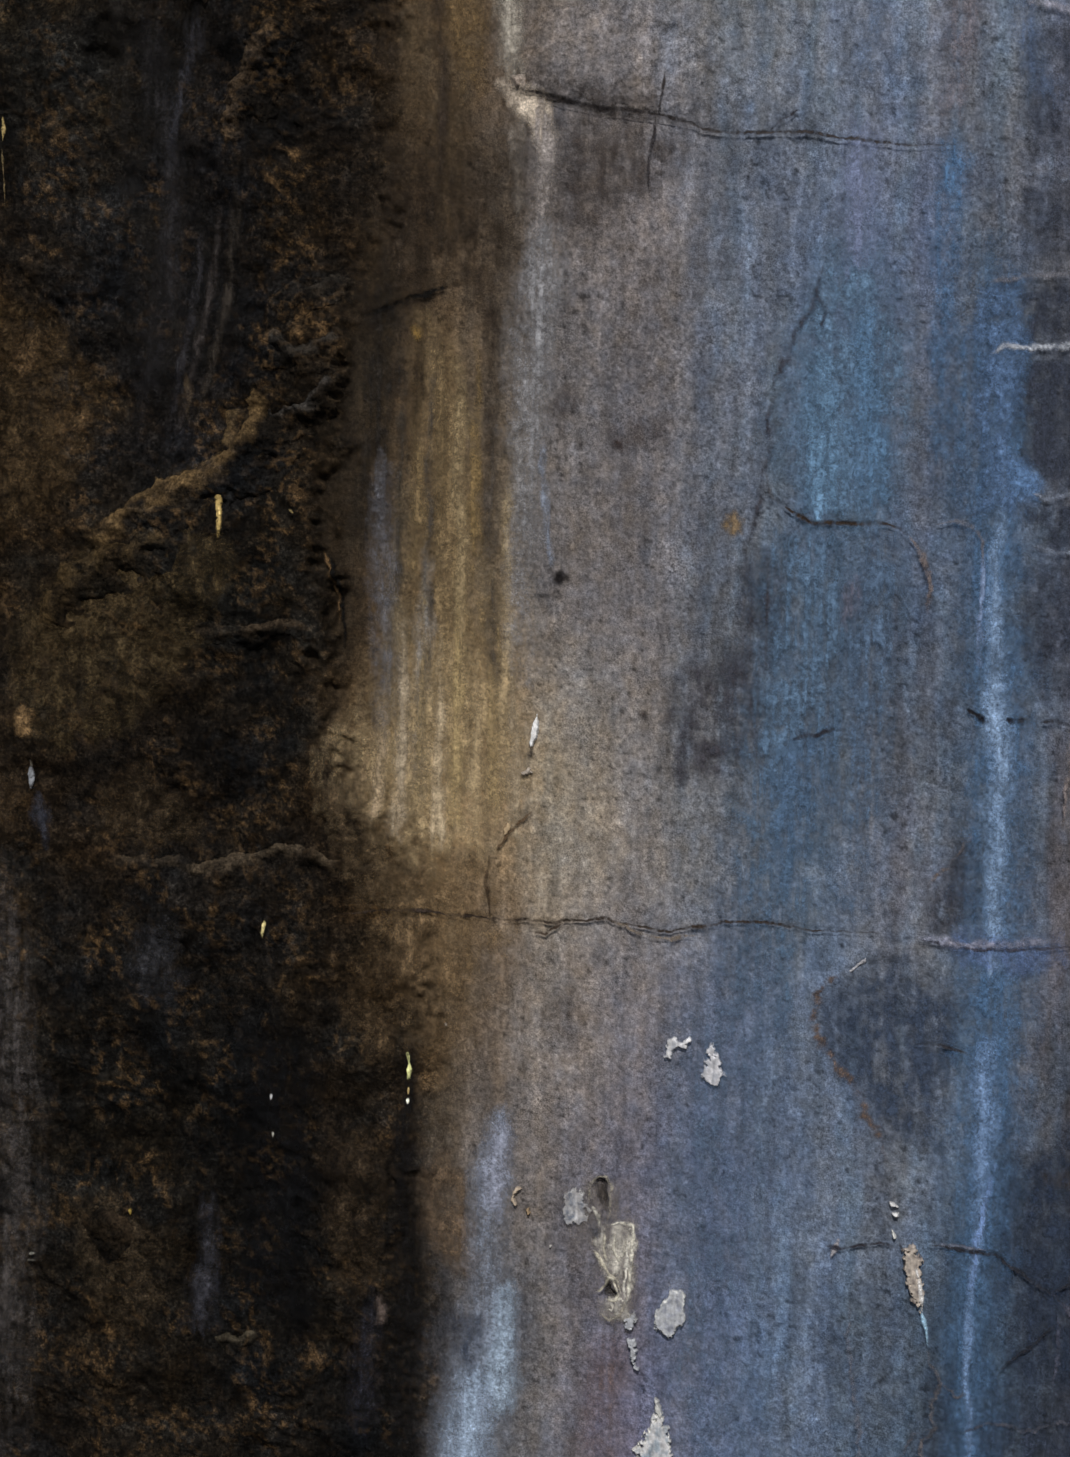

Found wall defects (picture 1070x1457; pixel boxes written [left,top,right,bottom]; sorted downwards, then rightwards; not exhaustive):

crack [525,74,939,181]
crack [753,288,984,598]
leakage [675,136,906,1048]
leakage [0,0,513,1457]
crack [352,812,845,942]
leakage [930,287,1070,1457]
crack [922,940,1069,952]
peeling [663,1032,727,1086]
peeling [511,1186,531,1216]
peeling [559,1175,686,1371]
crack [828,1242,891,1250]
peeling [632,1397,673,1457]